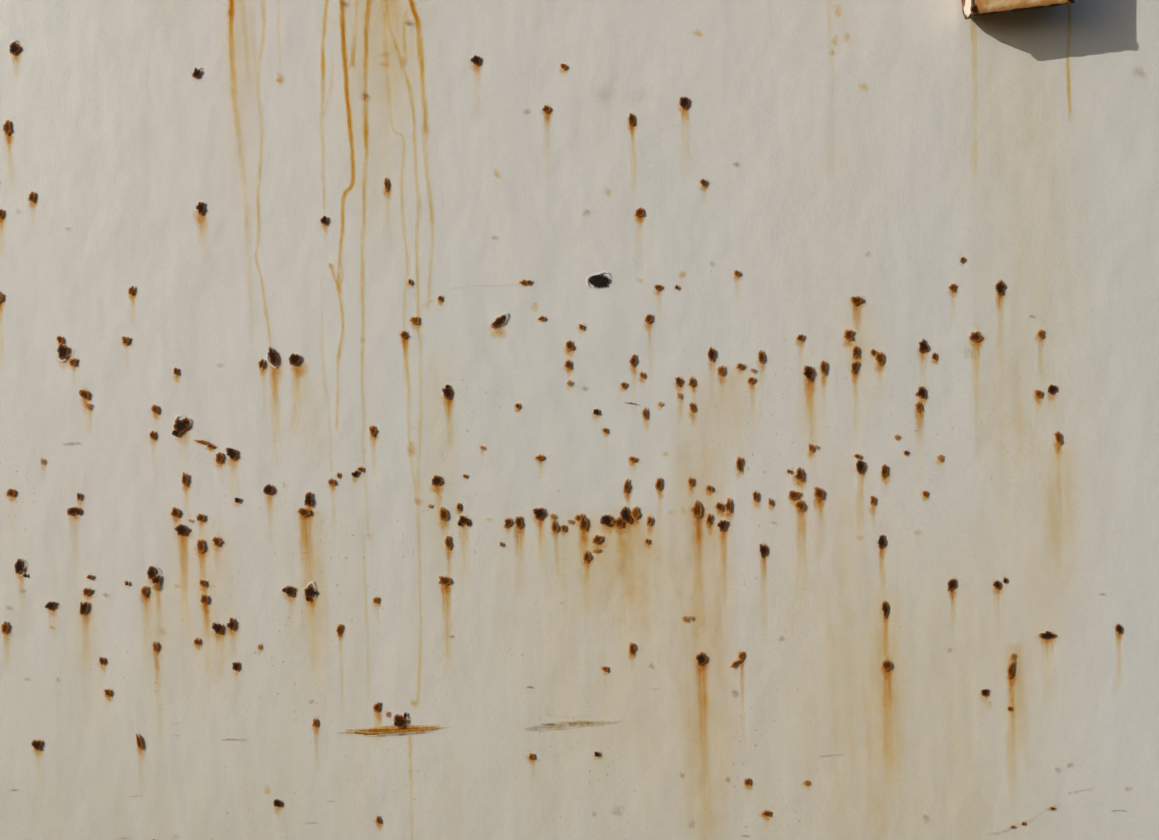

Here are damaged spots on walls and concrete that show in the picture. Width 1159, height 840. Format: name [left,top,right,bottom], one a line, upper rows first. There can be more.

corrosion [961,0,1074,19]
corrosion [717,350,765,384]
corrosion [844,330,885,374]
corrosion [675,377,695,412]
corrosion [194,440,223,464]
corrosion [171,507,205,523]
corrosion [197,537,221,554]
corrosion [428,502,461,521]
corrosion [504,517,523,529]
corrosion [550,513,603,562]
corrosion [688,478,731,525]
corrosion [787,467,824,511]